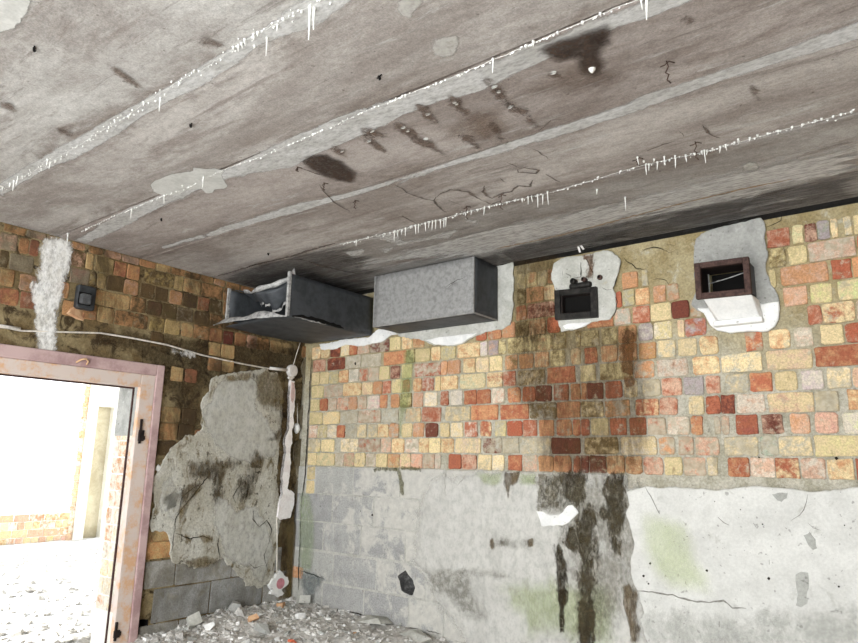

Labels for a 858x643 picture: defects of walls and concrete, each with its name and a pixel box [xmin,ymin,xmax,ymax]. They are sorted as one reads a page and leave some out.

leakage [0,0,332,191]
leakage [81,0,648,232]
crack [397,119,561,212]
leakage [227,109,857,292]
leakage [97,331,320,601]
leakage [538,470,627,643]
crack [642,590,770,612]